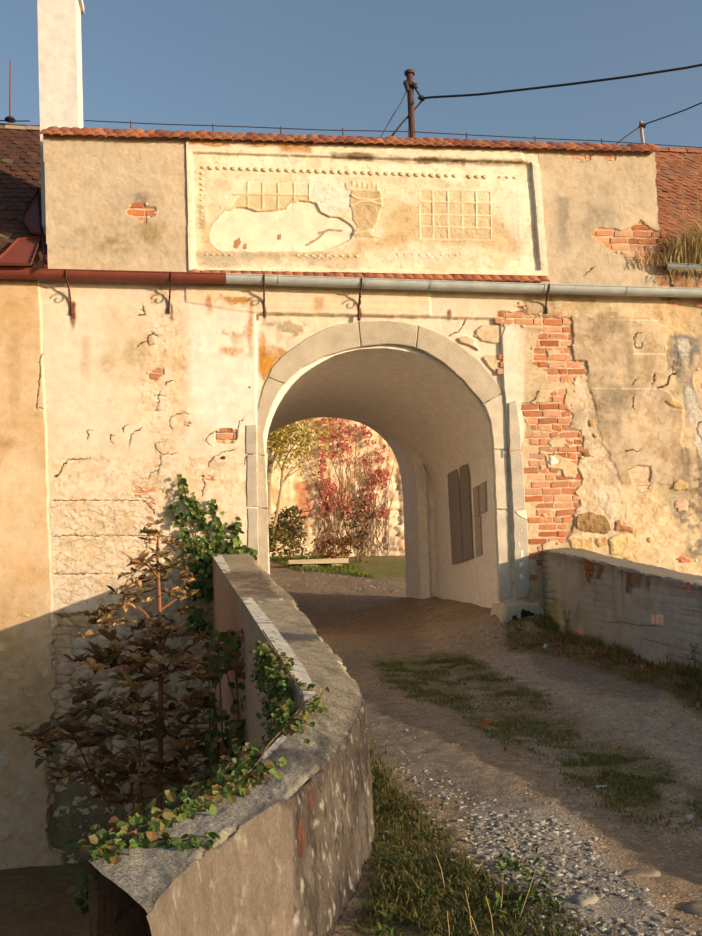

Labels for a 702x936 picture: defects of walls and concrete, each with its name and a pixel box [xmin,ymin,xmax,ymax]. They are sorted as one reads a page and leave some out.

flaking render [126,202,157,224]
flaking render [591,219,676,287]
flaking render [666,298,702,309]
damp [671,335,699,371]
flaking render [147,367,164,382]
flaking render [692,368,702,392]
damp [684,383,702,458]
flaking render [214,428,237,444]
flaking render [457,301,654,591]
flaking render [131,486,169,508]
damp [676,484,702,528]